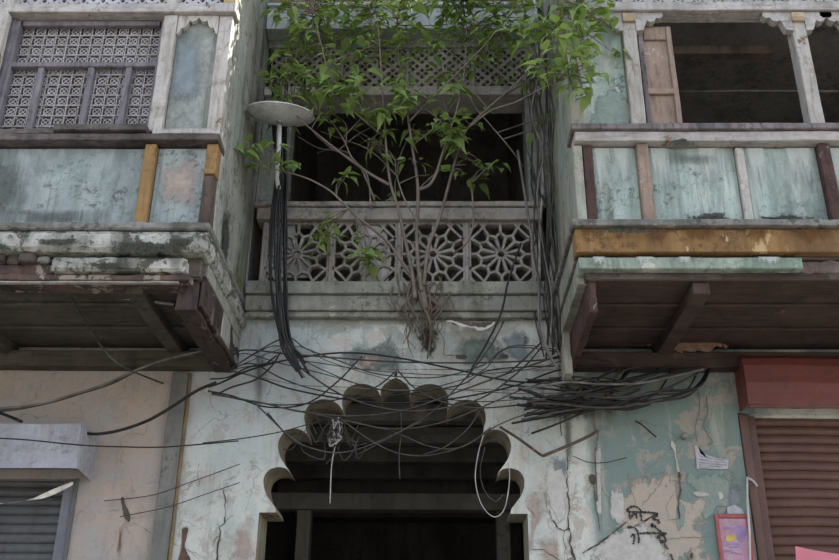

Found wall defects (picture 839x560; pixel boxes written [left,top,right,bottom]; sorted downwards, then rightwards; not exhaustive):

crack [173,491,234,560]
crack [532,449,643,560]
peeling [587,447,740,560]
crack [627,441,711,539]